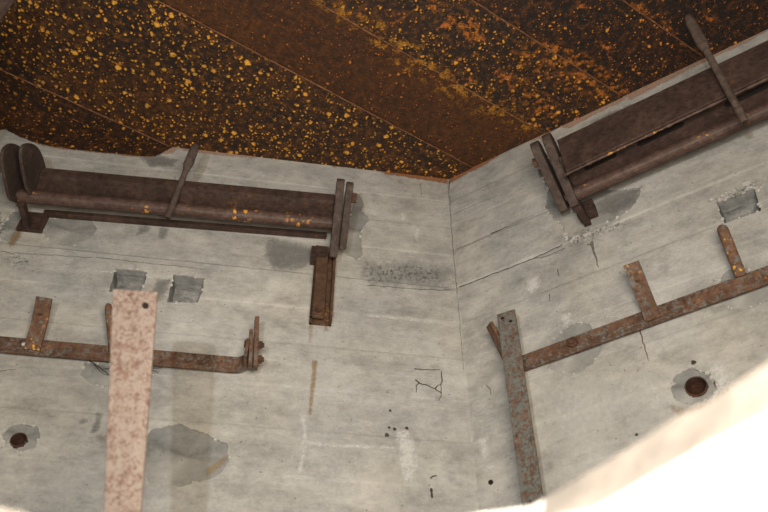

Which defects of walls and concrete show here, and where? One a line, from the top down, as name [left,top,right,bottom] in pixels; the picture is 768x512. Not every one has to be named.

rust [448,15,483,45]
rust [371,22,766,140]
water stain [268,243,311,268]
spalling [553,321,592,344]
spalling [548,344,602,375]
crack [415,368,443,400]
spalling [668,360,720,408]
spalling [2,422,42,454]